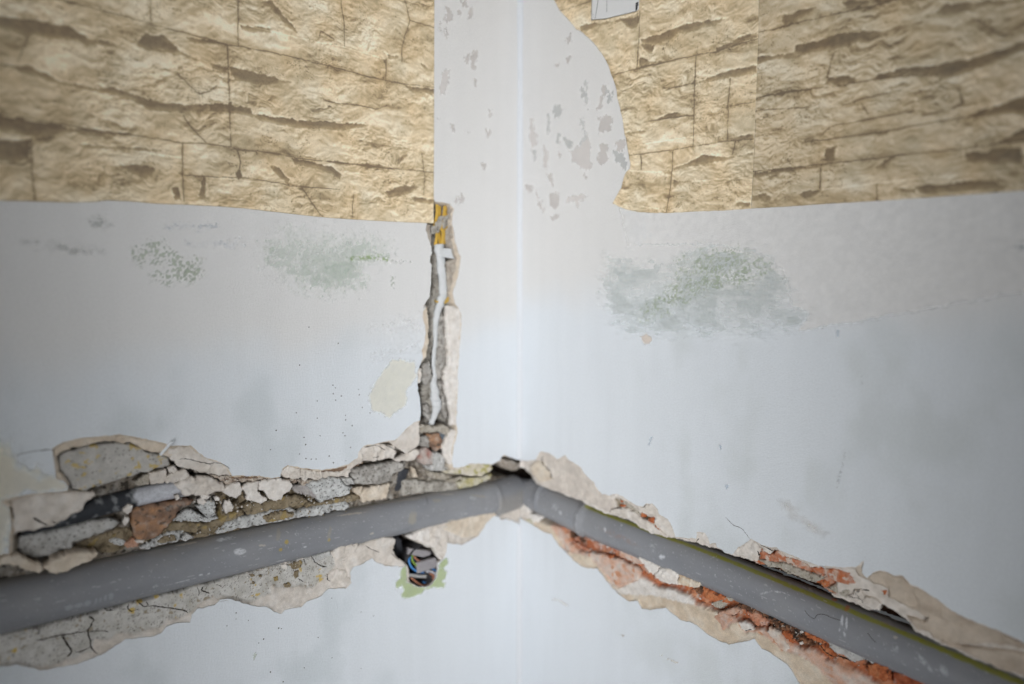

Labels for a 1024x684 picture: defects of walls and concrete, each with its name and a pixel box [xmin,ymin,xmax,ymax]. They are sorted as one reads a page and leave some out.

flaking render [0,421,1024,684]